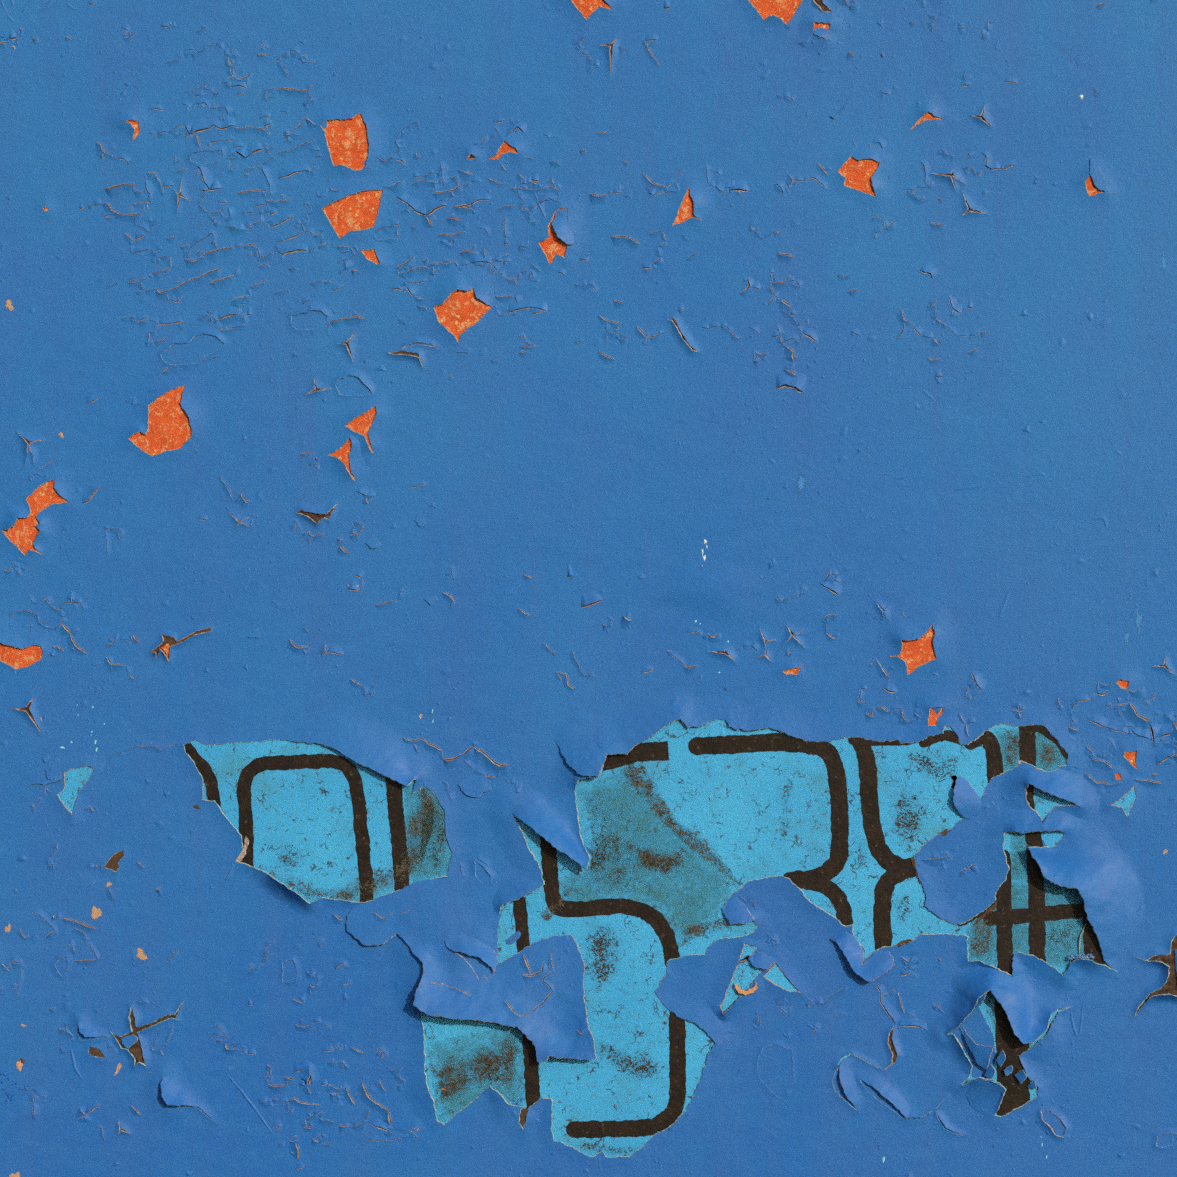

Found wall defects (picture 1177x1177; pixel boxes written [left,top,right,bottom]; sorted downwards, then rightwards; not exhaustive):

peeling [168,174,196,221]
peeling [300,92,399,284]
peeling [486,122,539,175]
peeling [521,186,594,282]
peeling [382,260,510,373]
peeling [171,596,1177,1171]
peeling [64,994,225,1133]